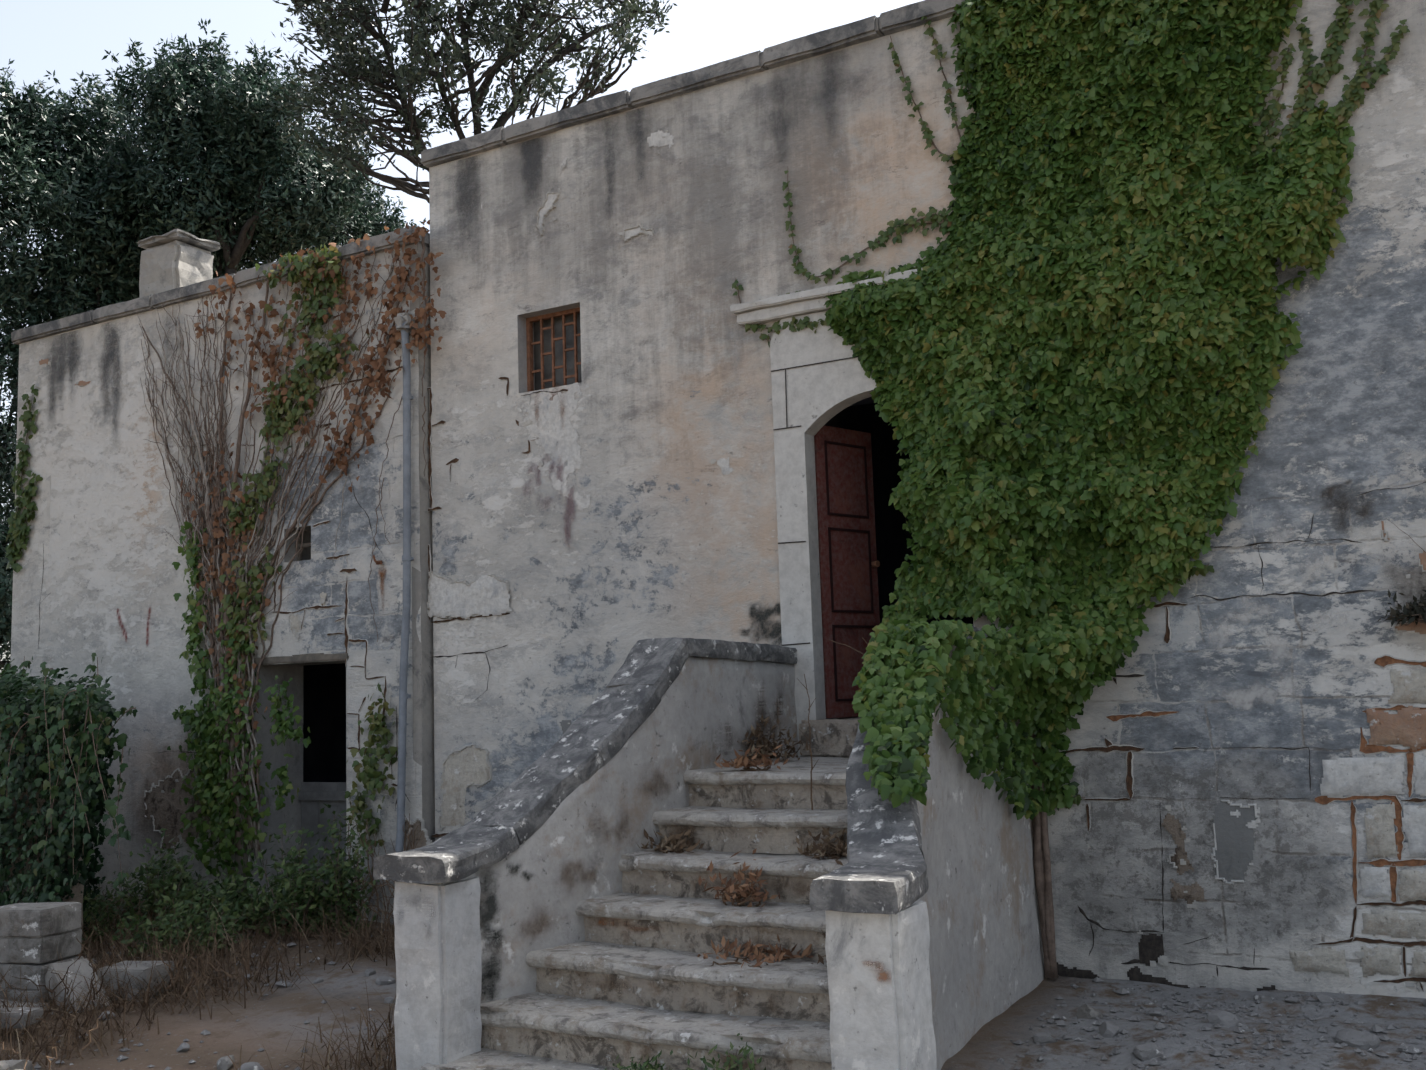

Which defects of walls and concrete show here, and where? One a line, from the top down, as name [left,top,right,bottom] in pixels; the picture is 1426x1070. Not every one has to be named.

water stain [102,335,119,423]
crack [316,366,459,581]
crack [1154,514,1373,643]
crack [273,483,410,808]
crack [429,613,510,697]
crack [1374,654,1426,668]
crack [1060,673,1269,977]
spalling [1162,800,1261,908]
crack [1219,704,1426,992]
spalling [1320,669,1426,901]
spalling [1289,938,1426,987]